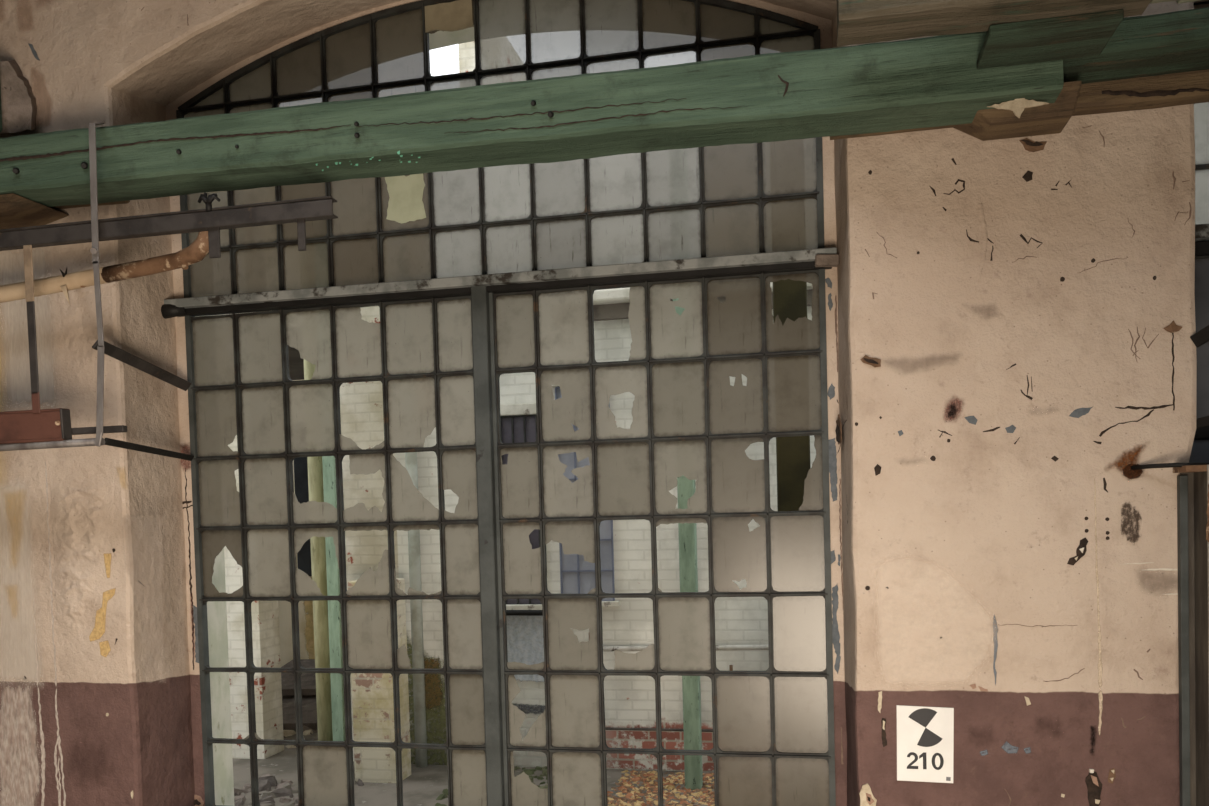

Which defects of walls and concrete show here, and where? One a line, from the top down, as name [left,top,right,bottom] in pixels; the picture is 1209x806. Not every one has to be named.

water stain [0,296,53,407]
crack [1093,327,1175,444]
rust [1109,446,1143,471]
water stain [0,462,66,806]
peeling [859,783,877,806]
spalling [1085,768,1116,806]